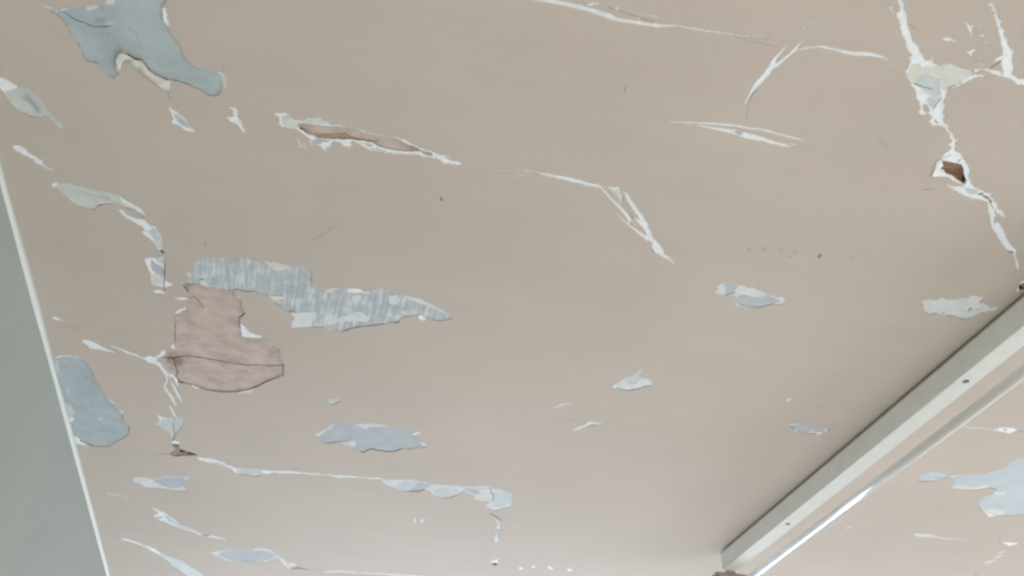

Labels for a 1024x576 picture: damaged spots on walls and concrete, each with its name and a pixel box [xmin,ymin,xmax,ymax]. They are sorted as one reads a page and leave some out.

peeling [41,0,227,132]
peeling [0,67,65,129]
flaking render [275,113,462,166]
crack [535,0,1024,270]
crack [491,169,677,266]
peeling [52,182,453,394]
peeling [921,296,998,319]
peeling [53,355,130,447]
peeling [315,424,426,452]
crack [152,508,227,540]
peeling [381,480,513,511]
peeling [917,458,1024,517]